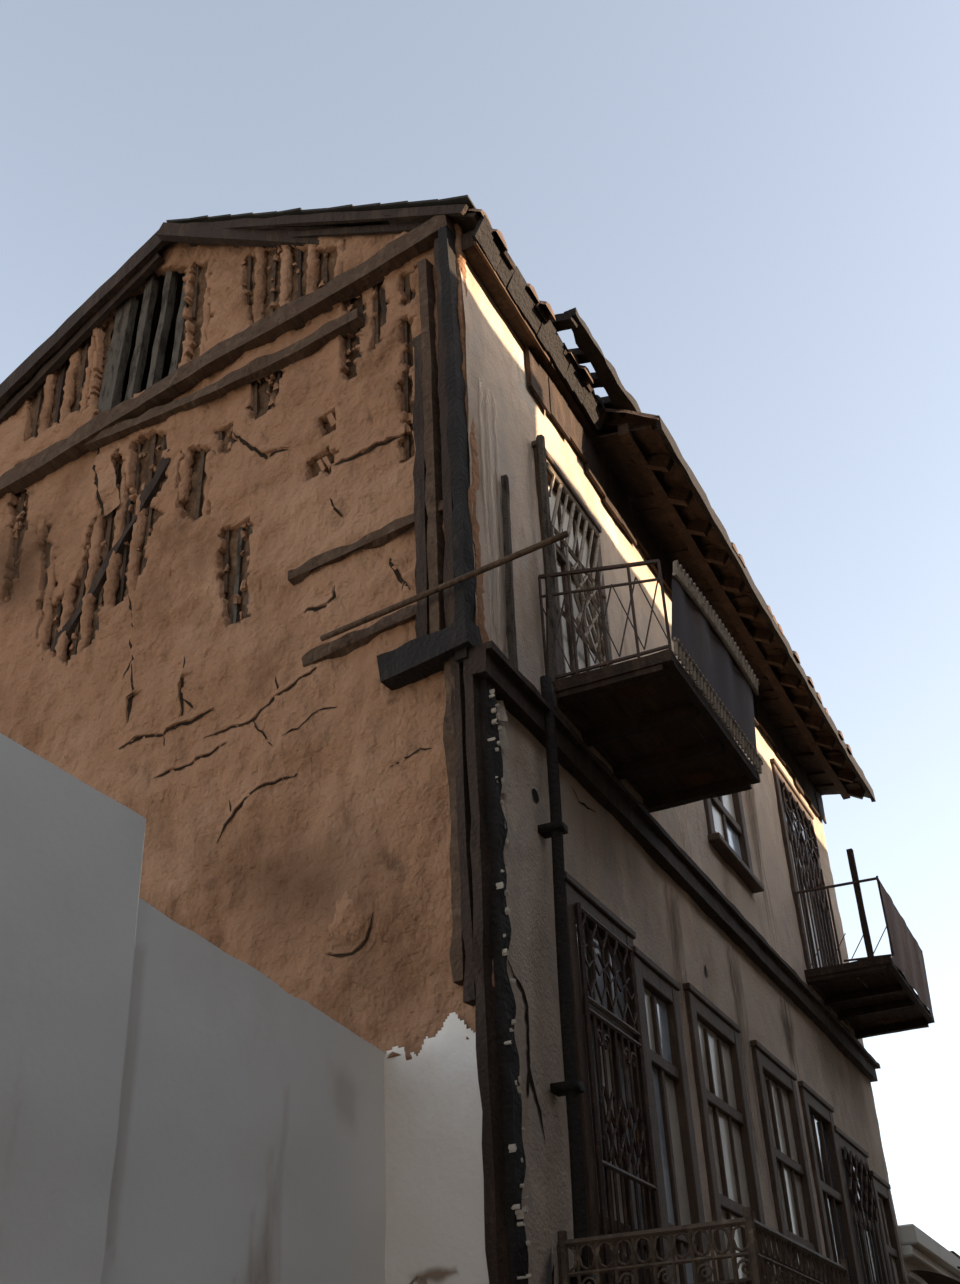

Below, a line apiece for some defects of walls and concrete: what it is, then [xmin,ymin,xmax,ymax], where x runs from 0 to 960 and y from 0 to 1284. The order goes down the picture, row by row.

spalling [28,316,114,438]
crack [233,421,293,460]
spalling [240,238,345,323]
spalling [332,281,388,380]
spalling [401,321,415,462]
spalling [404,275,416,305]
spalling [4,424,236,663]
spalling [223,522,253,624]
crack [116,592,336,843]
crack [324,914,373,957]
peeling [480,678,554,1284]